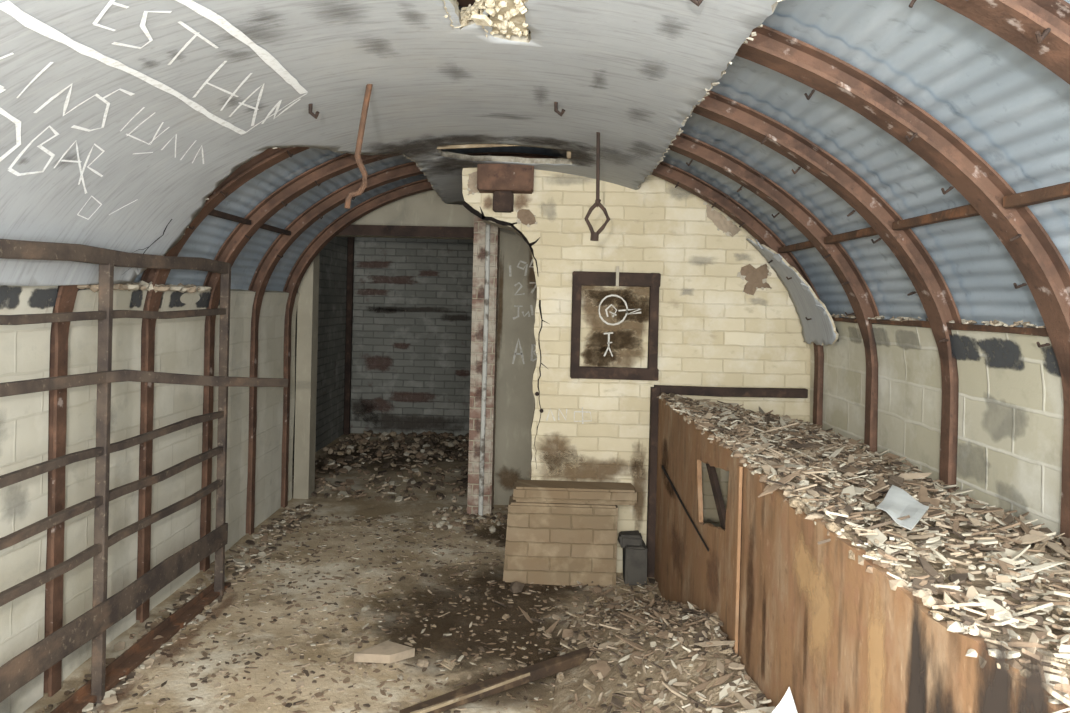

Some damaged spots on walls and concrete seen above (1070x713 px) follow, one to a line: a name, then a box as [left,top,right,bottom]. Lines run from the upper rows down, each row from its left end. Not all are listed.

spalling [443,0,529,39]
crack [462,201,549,469]
peeling [703,201,839,345]
leakage [541,436,645,520]